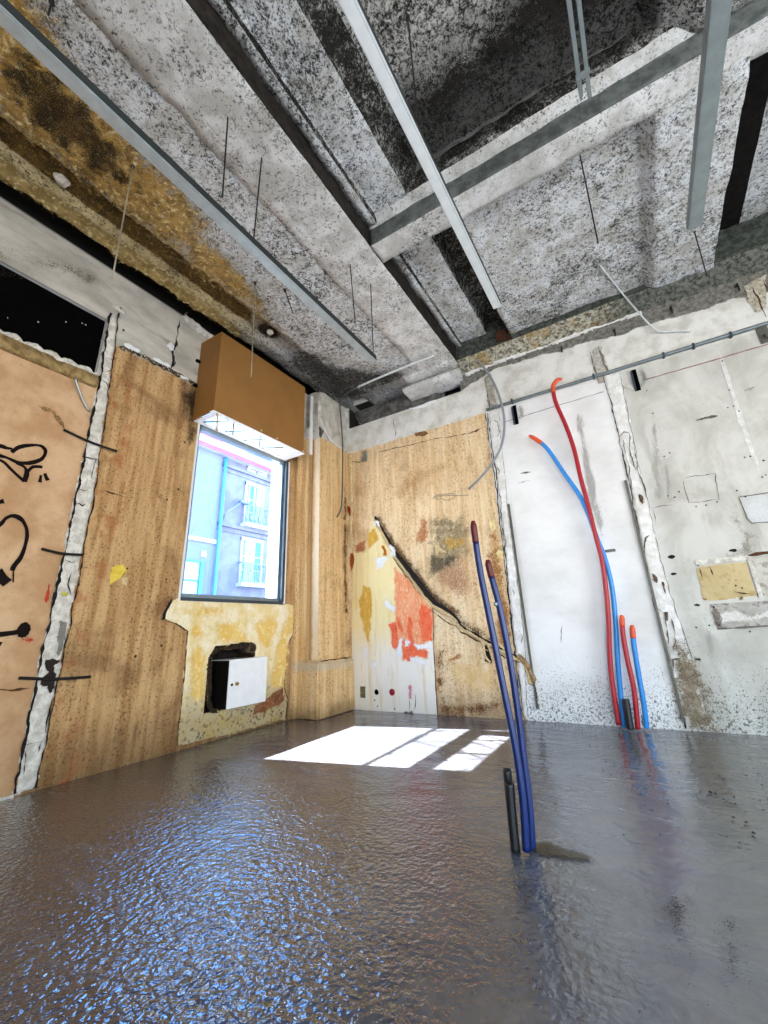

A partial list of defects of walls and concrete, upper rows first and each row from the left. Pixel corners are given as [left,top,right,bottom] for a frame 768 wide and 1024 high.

damp [8,0,146,126]
damp [394,0,629,152]
damp [0,26,277,340]
flaking render [12,305,197,795]
peeling [375,545,396,570]
flaking render [206,642,255,713]
peeling [394,637,434,666]